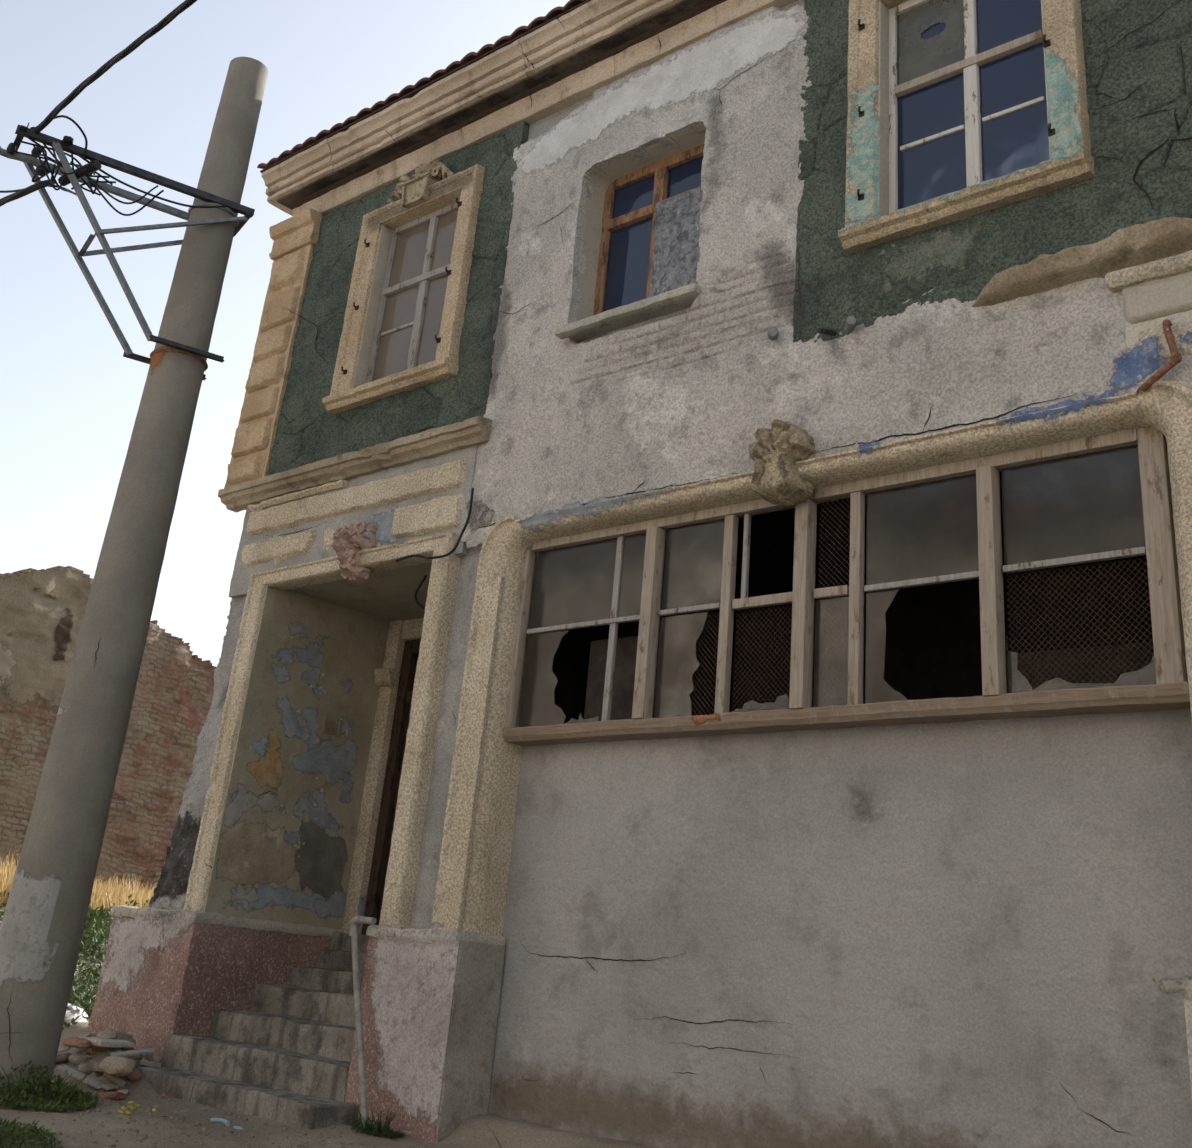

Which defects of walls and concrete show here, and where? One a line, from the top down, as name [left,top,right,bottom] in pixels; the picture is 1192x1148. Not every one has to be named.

peeling [839,83,882,233]
peeling [896,48,1082,212]
crack [1085,80,1192,220]
peeling [520,484,676,533]
spalling [216,640,367,919]
crack [520,941,686,971]
crack [636,1016,795,1079]